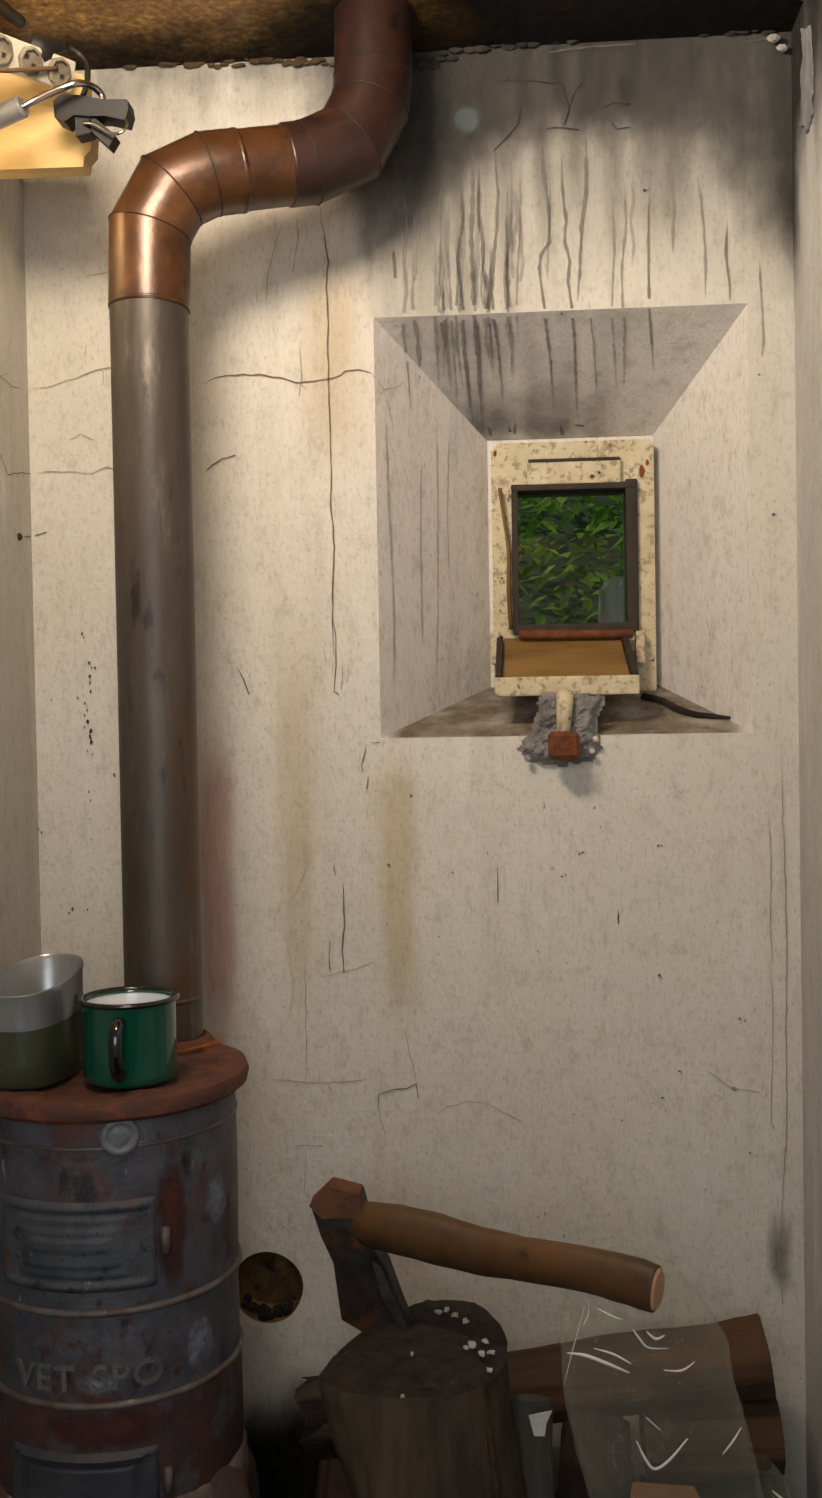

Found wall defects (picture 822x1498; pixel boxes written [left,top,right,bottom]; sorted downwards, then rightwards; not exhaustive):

damp [392,169,521,394]
damp [538,153,597,389]
damp [611,202,627,366]
damp [699,194,707,280]
crack [0,433,113,476]
crack [204,209,404,695]